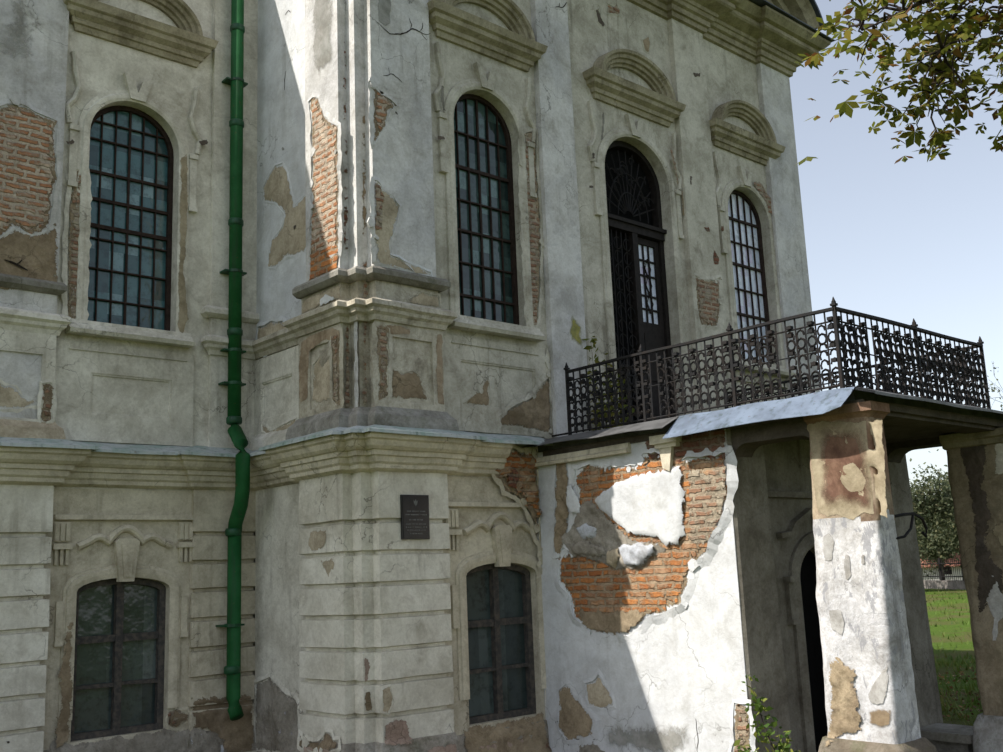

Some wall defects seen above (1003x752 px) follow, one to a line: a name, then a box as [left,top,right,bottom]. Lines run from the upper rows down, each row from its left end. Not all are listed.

crack [376,18,429,40]
spalling [362,75,400,149]
spalling [0,95,92,320]
spalling [262,92,348,281]
flaking render [362,159,433,277]
flaking render [302,284,341,313]
flaking render [406,289,442,309]
spalling [693,250,723,330]
spalling [462,349,739,646]
flaking render [49,622,341,752]
flaking render [464,669,617,752]
flaking render [825,657,889,747]